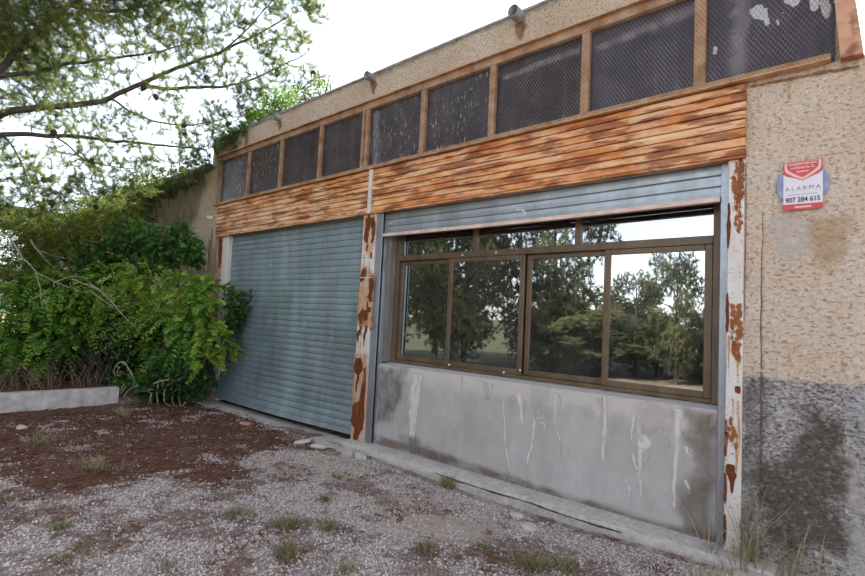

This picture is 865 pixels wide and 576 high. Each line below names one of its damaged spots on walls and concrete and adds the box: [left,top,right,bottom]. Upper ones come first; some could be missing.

peeling [749,0,835,26]
rust [726,159,747,248]
rust [351,214,376,441]
rust [725,293,744,366]
rust [723,386,741,503]
water stain [743,412,864,555]